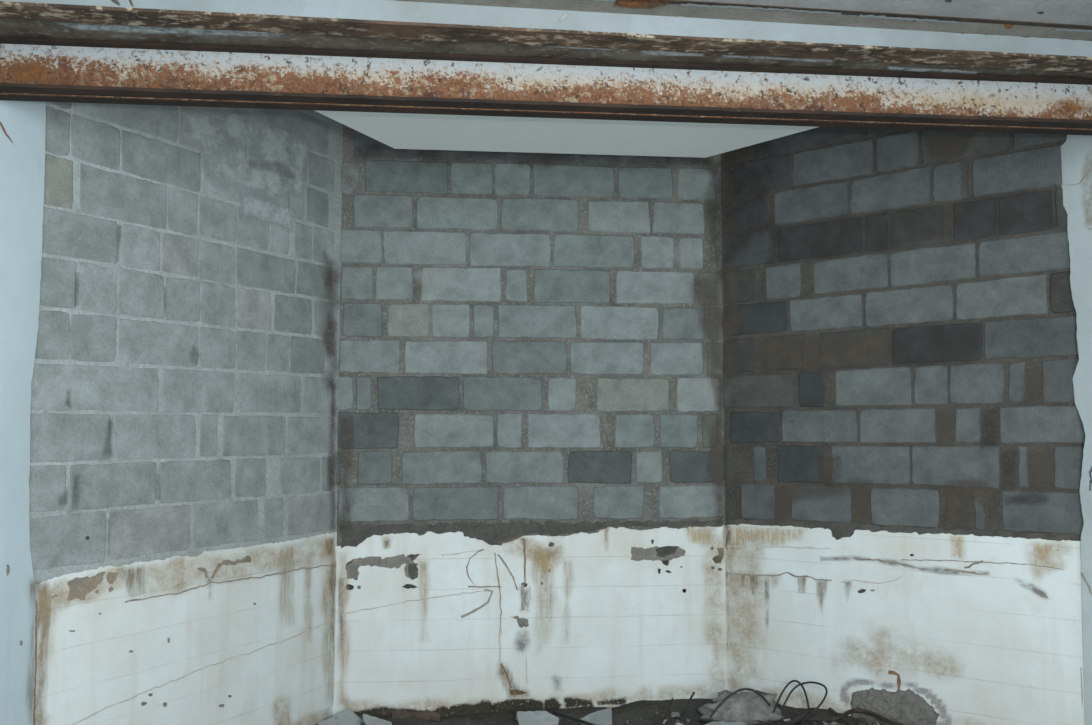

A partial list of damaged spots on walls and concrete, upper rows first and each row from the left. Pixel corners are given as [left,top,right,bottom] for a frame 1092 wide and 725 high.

peeling [51,572,119,601]
spalling [345,554,420,590]
spalling [631,540,686,574]
peeling [710,547,903,600]
crack [901,559,1092,595]
crack [72,540,531,725]
damp [31,583,50,725]